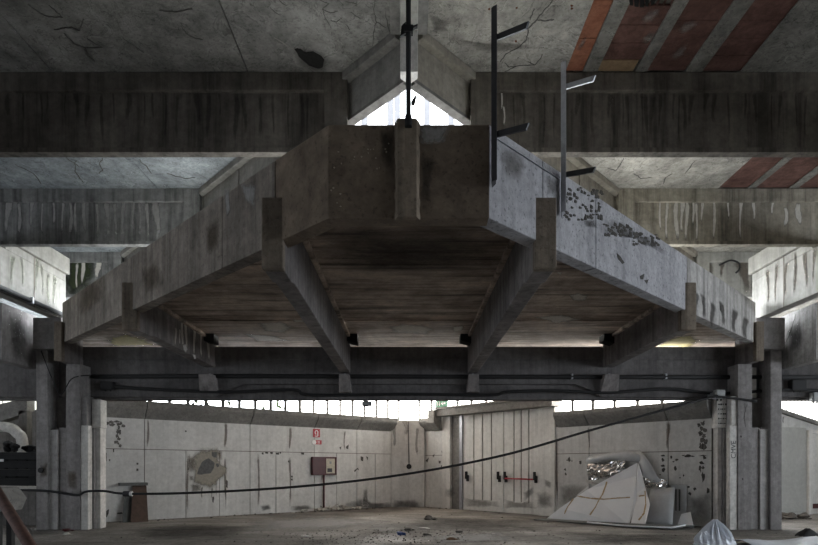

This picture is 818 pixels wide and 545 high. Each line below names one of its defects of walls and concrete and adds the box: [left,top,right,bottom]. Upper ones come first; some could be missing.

crack [28,4,103,62]
crack [500,0,554,72]
peeling [563,187,660,247]
water stain [659,203,716,238]
water stain [739,203,755,236]
water stain [784,204,802,225]
water stain [35,260,56,300]
water stain [766,250,816,299]
peeling [106,420,125,461]
spalling [197,452,219,475]
peeling [659,421,710,496]